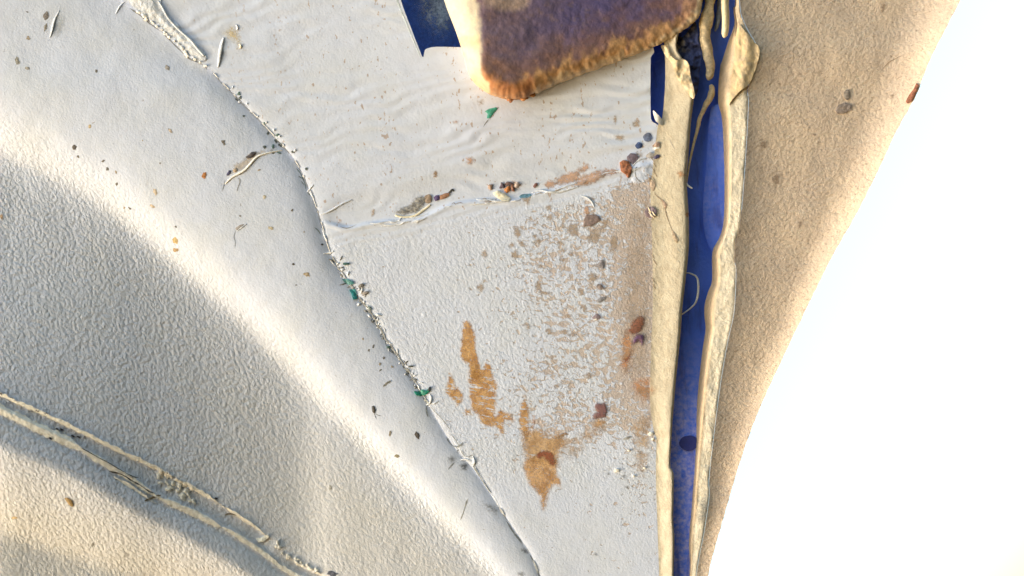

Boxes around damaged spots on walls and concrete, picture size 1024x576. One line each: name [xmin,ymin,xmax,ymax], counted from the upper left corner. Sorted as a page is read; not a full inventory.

peeling [116,0,207,68]
peeling [222,150,282,191]
peeling [444,133,660,208]
peeling [371,194,432,227]
peeling [414,385,438,405]
corrosion [446,321,576,507]
peeling [0,392,338,576]